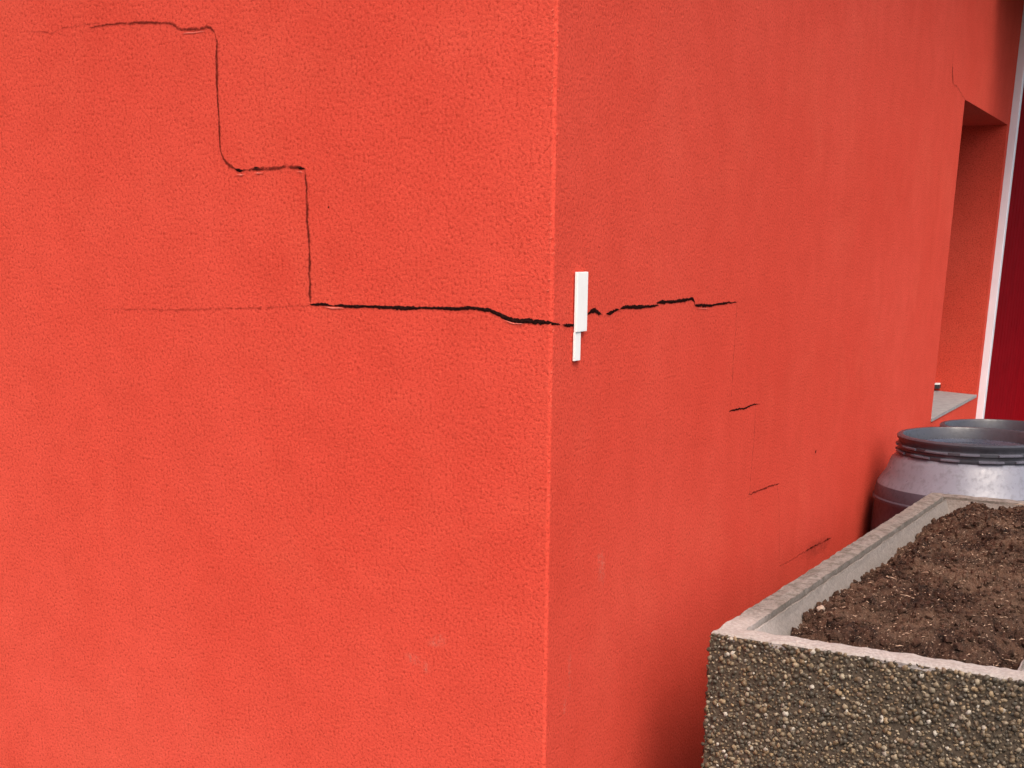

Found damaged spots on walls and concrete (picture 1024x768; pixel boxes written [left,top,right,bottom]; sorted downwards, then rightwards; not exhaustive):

crack [91,21,736,327]